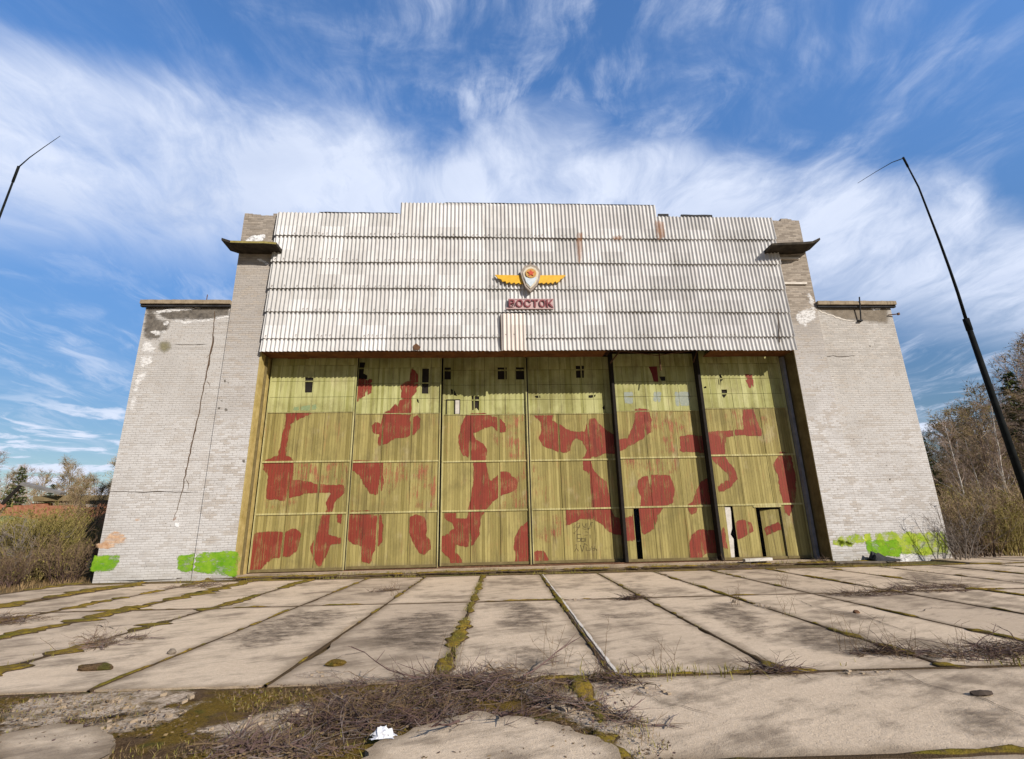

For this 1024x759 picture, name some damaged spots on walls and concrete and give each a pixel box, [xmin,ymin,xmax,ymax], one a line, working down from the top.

leakage [144,307,229,338]
peeling [794,293,816,327]
crack [111,311,215,520]